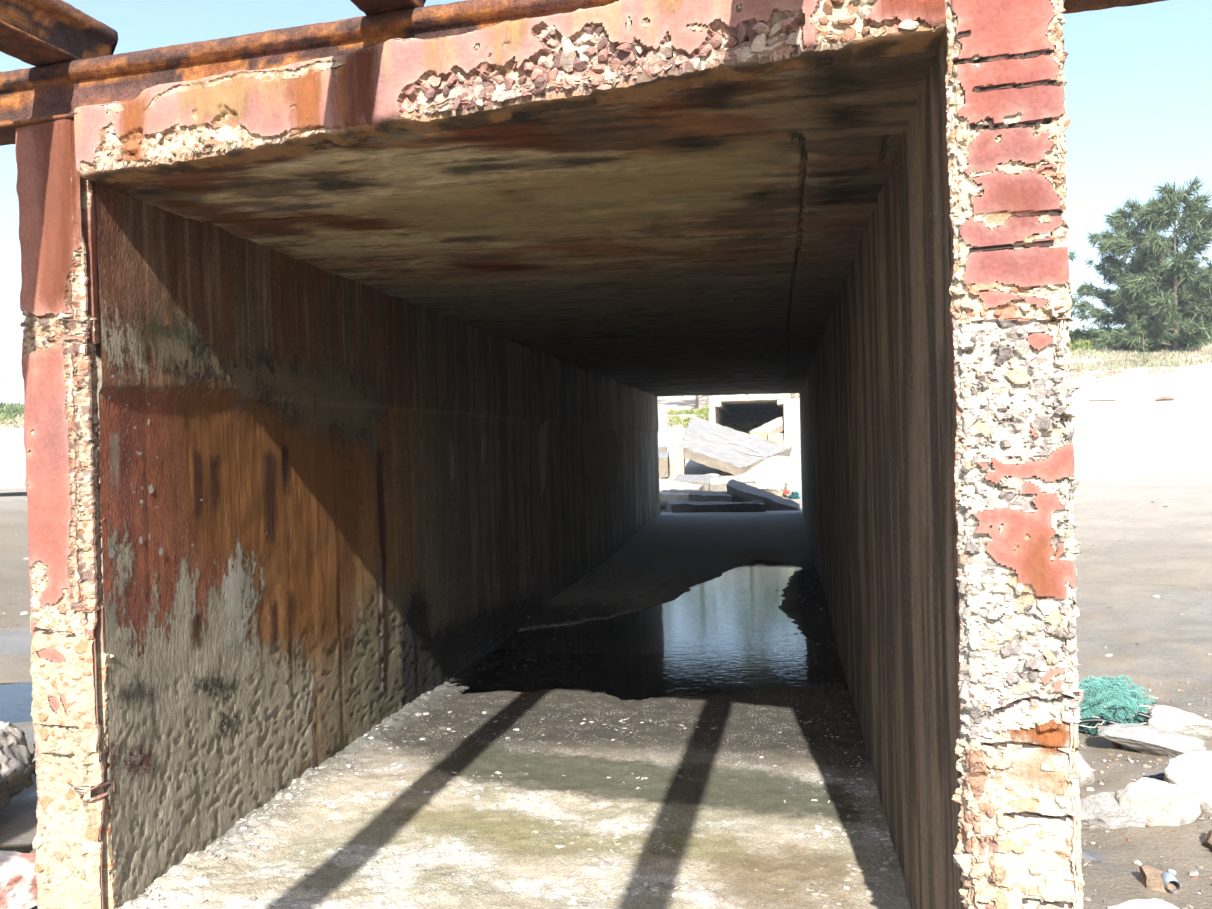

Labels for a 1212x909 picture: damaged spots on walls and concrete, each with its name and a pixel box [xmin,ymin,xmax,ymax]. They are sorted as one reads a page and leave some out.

corrosion [493,19,523,64]
corrosion [120,102,143,164]
corrosion [274,70,320,129]
corrosion [335,51,373,125]
crack [788,131,808,377]
spalling [398,0,1086,909]
peeling [20,102,347,909]
corrosion [376,449,387,693]
leakage [397,581,542,706]
crack [981,692,1080,753]
crack [1003,812,1082,821]
crack [1022,899,1073,909]